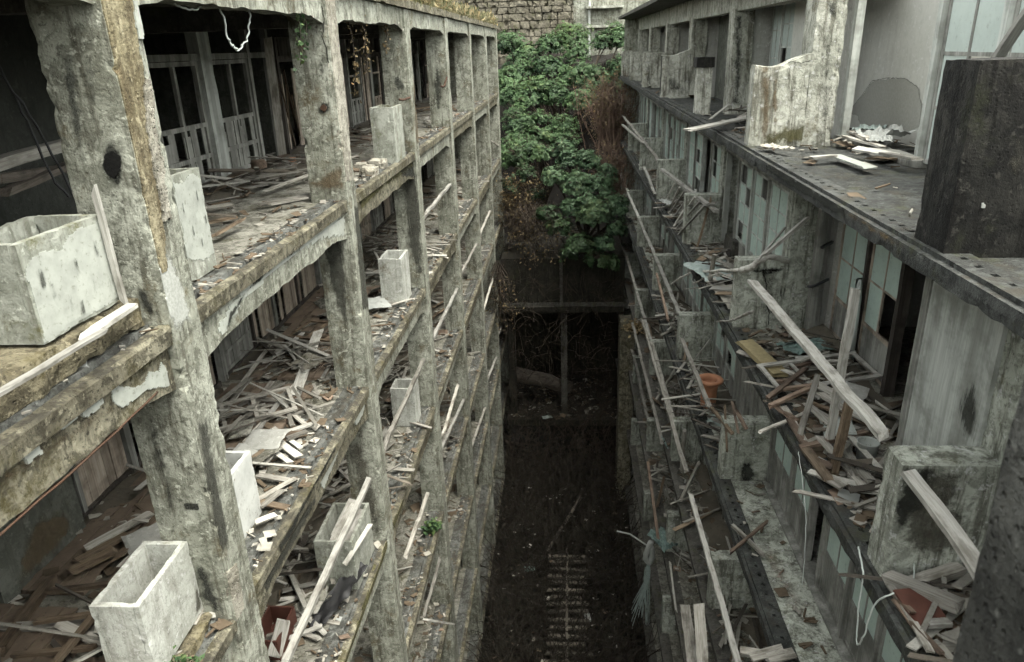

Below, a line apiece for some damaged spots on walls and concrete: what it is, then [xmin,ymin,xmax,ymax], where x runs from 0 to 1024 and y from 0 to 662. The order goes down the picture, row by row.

spalling [66,60,81,143]
spalling [101,0,214,273]
peeling [852,78,922,132]
damp [960,385,976,435]
peeling [0,362,170,536]
damp [895,484,951,552]
damp [907,470,961,520]